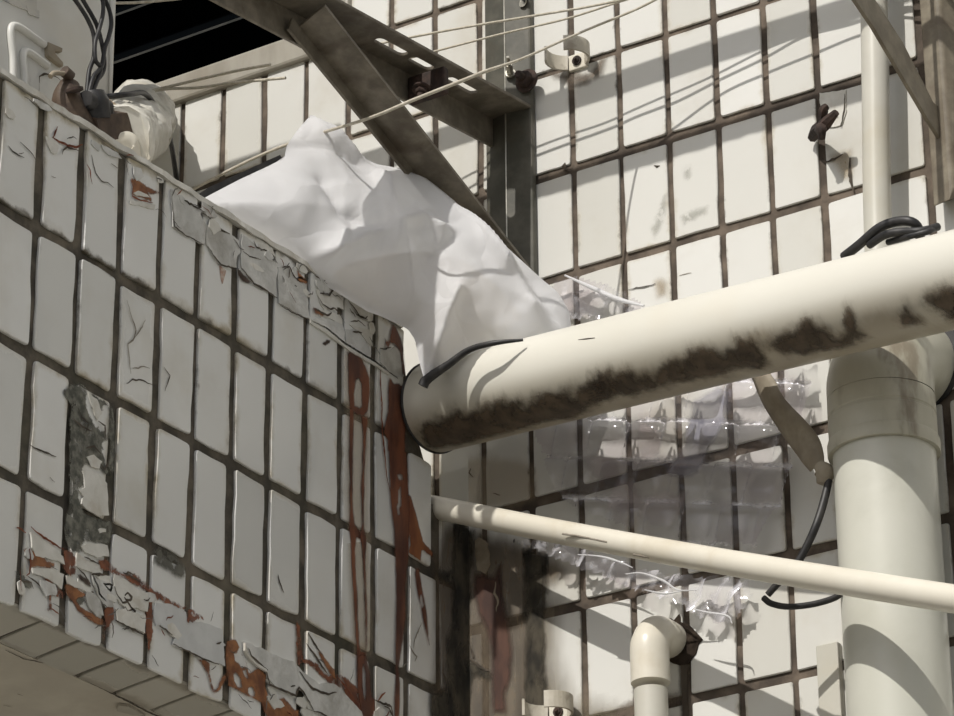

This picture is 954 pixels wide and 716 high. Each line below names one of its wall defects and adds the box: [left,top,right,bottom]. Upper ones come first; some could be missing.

peeling [156,176,404,379]
spalling [16,384,185,640]
rust [296,324,433,716]
rust [199,639,299,716]
peeling [265,679,313,716]
peeling [373,692,394,716]
leakage [430,523,560,716]